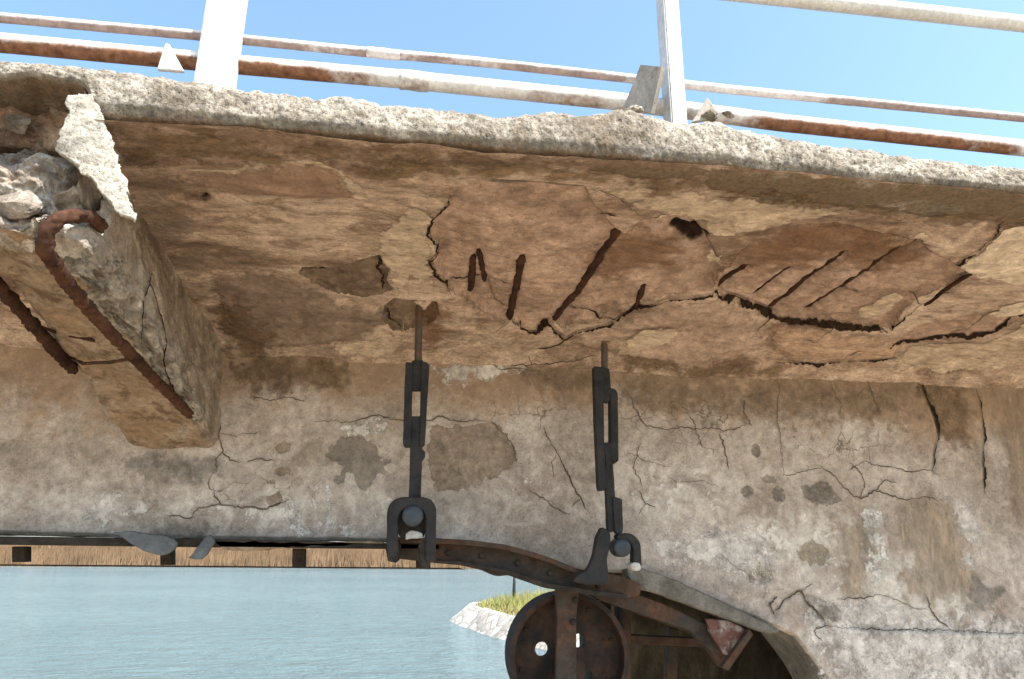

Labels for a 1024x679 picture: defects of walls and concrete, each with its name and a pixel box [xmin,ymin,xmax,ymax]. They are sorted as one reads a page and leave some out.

crack [588,189,646,216]
spalling [0,277,79,375]
spalling [22,94,205,421]
spalling [299,181,1024,375]
crack [426,198,1023,514]
crack [167,424,289,519]
crack [254,396,516,460]
crack [769,584,1024,640]